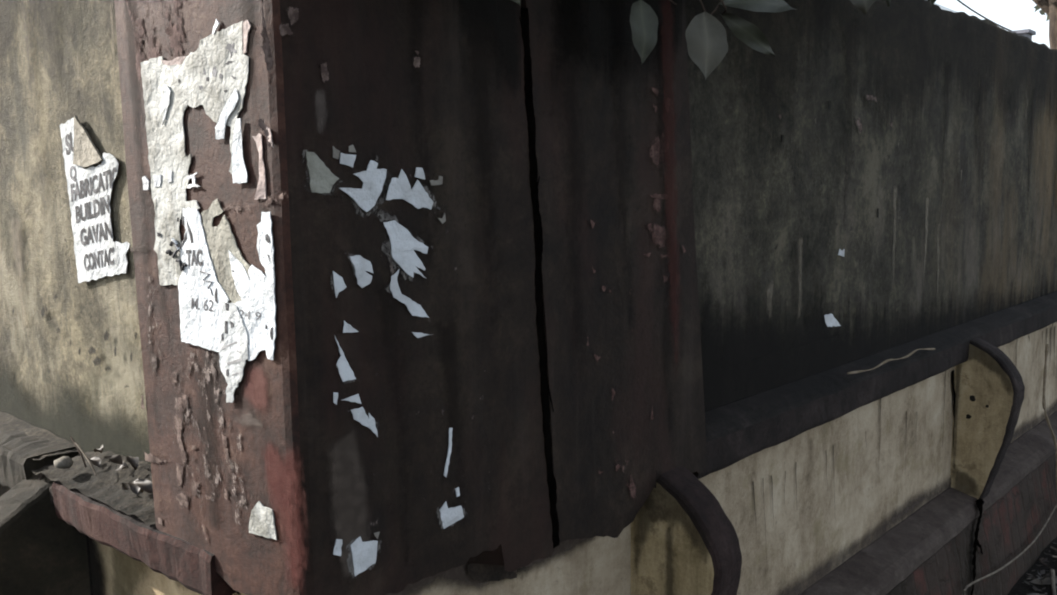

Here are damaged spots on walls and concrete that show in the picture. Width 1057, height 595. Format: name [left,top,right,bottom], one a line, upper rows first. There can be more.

crack [519,7,560,548]
crack [970,498,984,595]